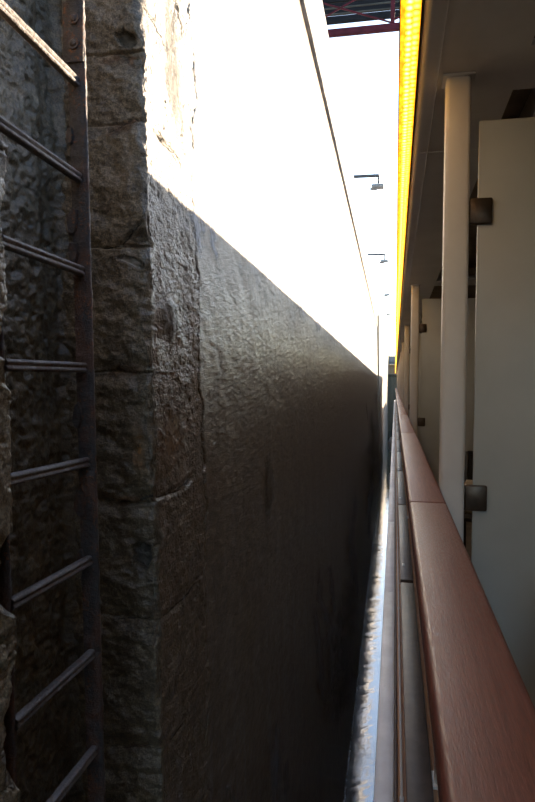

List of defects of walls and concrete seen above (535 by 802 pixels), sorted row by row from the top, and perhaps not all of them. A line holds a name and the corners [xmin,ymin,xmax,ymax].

damp [286,0,377,327]